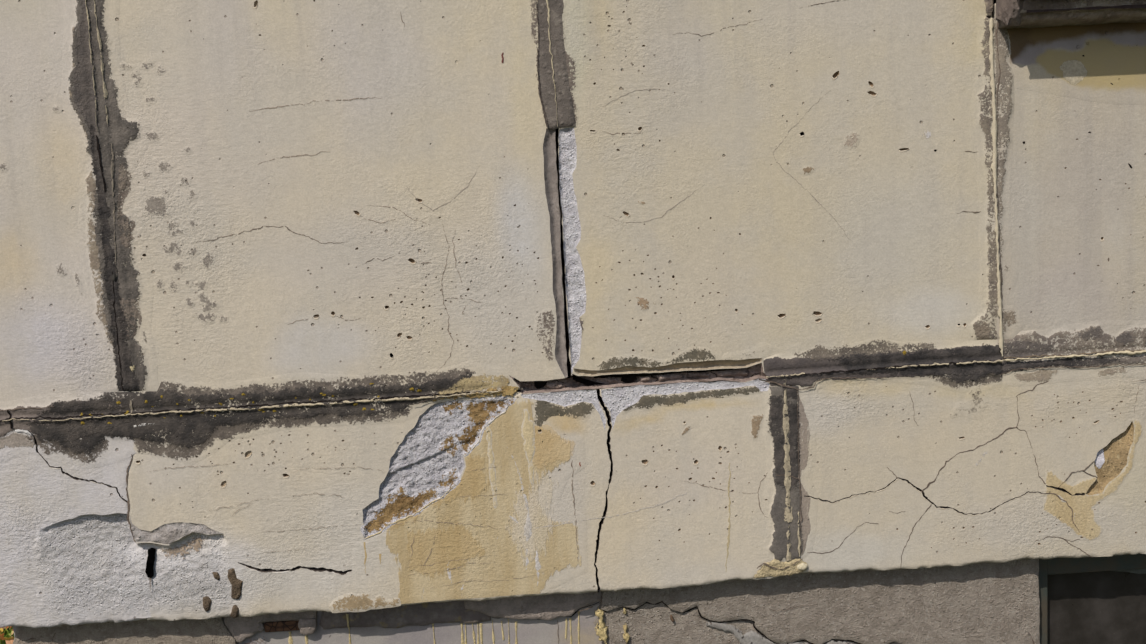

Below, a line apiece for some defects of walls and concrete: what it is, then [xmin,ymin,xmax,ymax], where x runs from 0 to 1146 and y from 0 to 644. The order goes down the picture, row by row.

leakage [1007,22,1146,105]
leakage [140,159,229,325]
crack [354,205,476,370]
spalling [361,0,819,578]
crack [29,431,136,542]
spalling [31,513,244,620]
crack [235,562,352,575]
leakage [0,361,596,604]
crack [411,129,860,644]
leakage [596,337,1006,420]
crack [687,363,1146,563]
spalling [1046,422,1134,529]